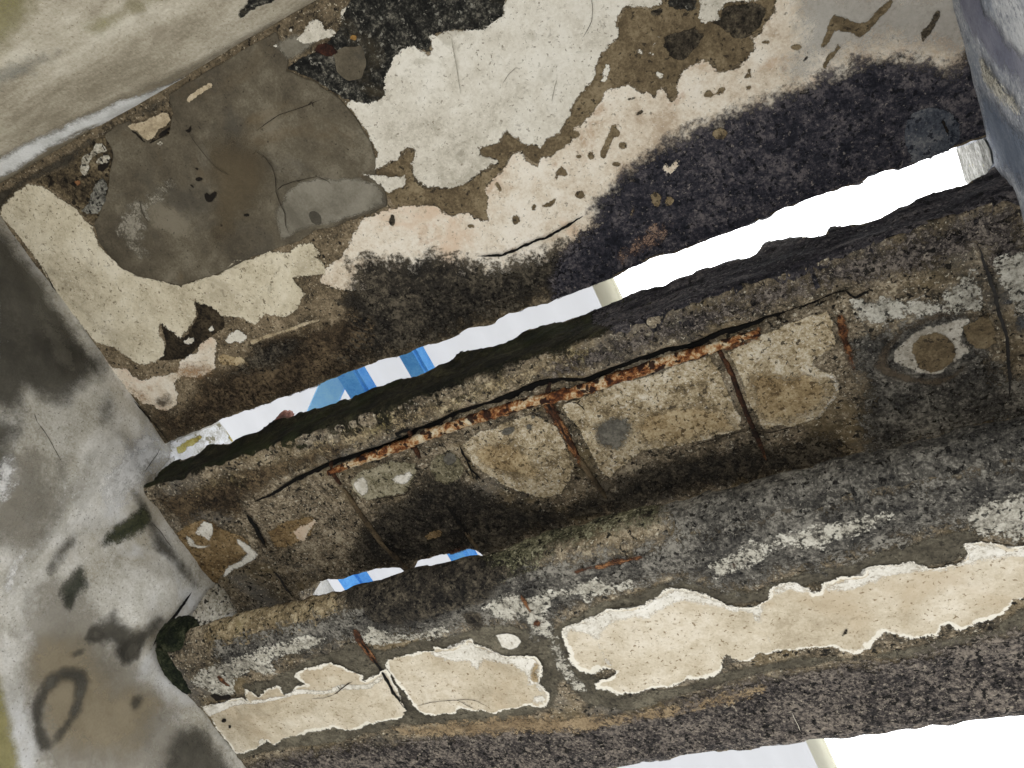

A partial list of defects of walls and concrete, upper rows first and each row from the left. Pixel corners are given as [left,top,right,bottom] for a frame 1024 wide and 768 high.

peeling [1,0,967,411]
crack [477,216,583,257]
crack [247,289,871,546]
corrosion [542,393,581,467]
water stain [103,0,1024,581]
peeling [327,311,839,500]
peeling [874,310,996,386]
peeling [177,519,258,626]
corrosion [353,629,377,663]
peeling [203,530,1024,760]